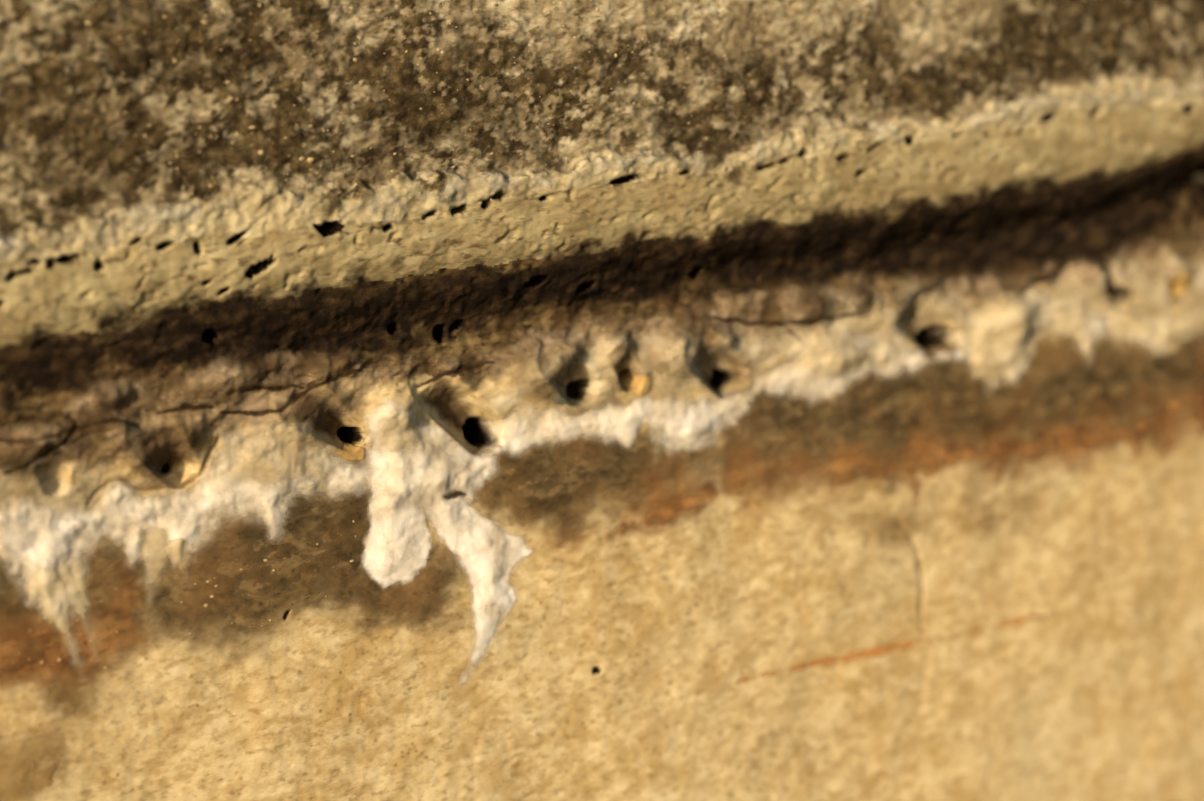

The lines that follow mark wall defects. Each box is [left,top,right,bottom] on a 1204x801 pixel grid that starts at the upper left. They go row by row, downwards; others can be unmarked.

water stain [0,0,1204,259]
crack [952,113,1054,137]
crack [757,149,806,170]
crack [836,137,913,161]
crack [610,174,639,185]
crack [423,193,504,218]
crack [314,221,344,237]
crack [131,231,245,254]
crack [6,255,103,281]
crack [708,313,864,342]
water stain [0,228,1204,664]
rust [790,639,928,670]